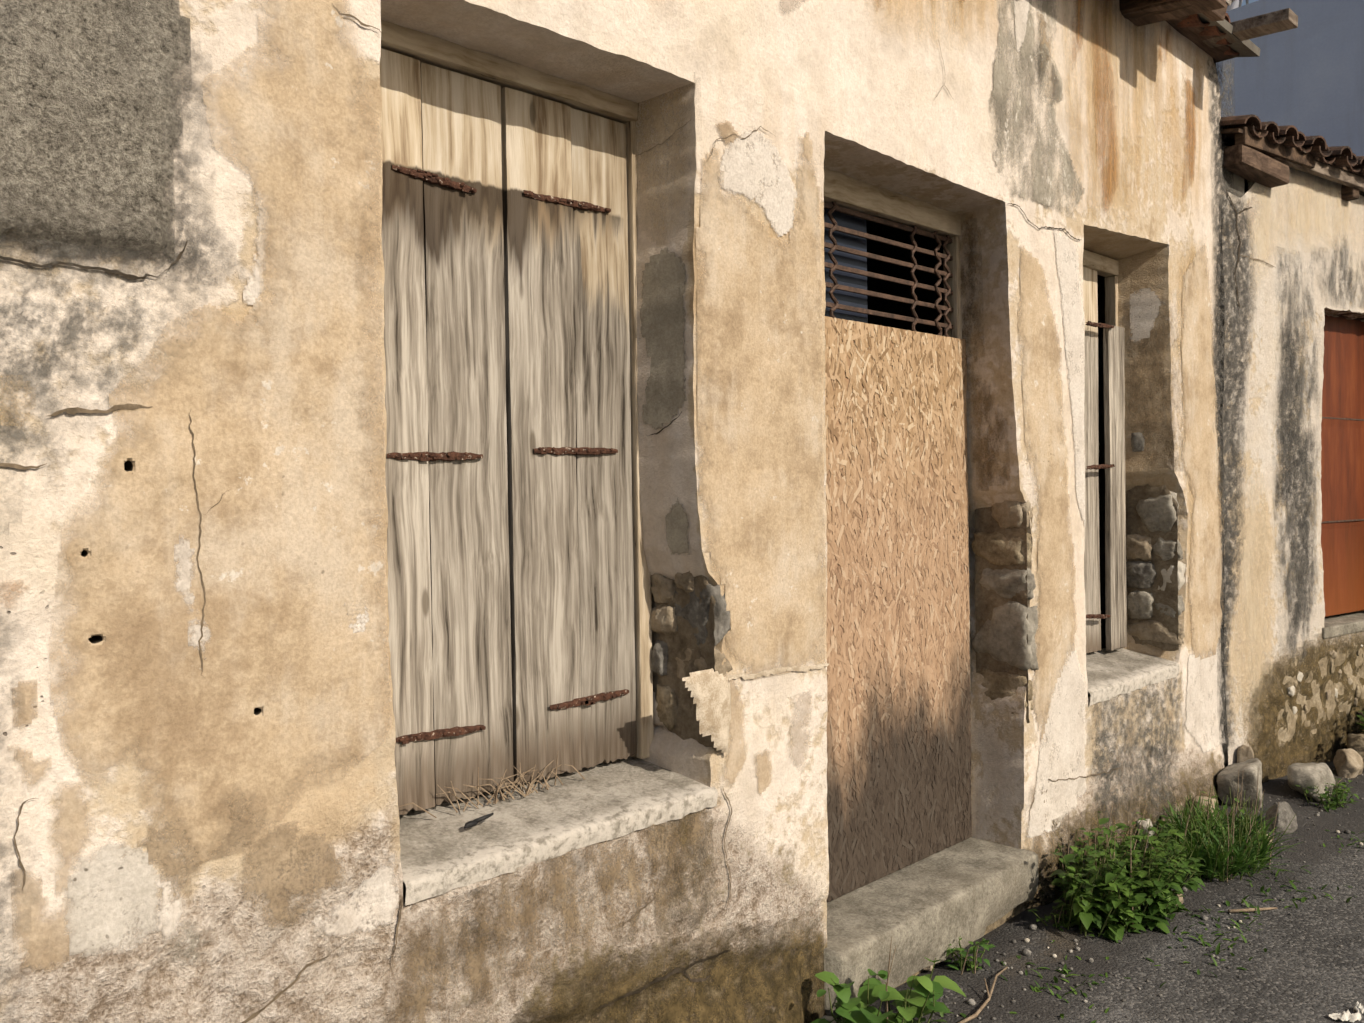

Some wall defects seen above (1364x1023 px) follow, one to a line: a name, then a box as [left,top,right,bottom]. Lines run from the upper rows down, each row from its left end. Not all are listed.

crack [0,240,188,280]
crack [48,403,153,416]
peeling [12,0,390,929]
crack [189,411,231,679]
peeling [640,121,826,794]
peeling [971,247,1077,740]
spalling [989,0,1084,216]
peeling [1126,246,1224,660]
water stain [1209,61,1275,749]
water stain [1276,261,1316,650]
water stain [1323,245,1364,301]
crack [242,954,330,1023]